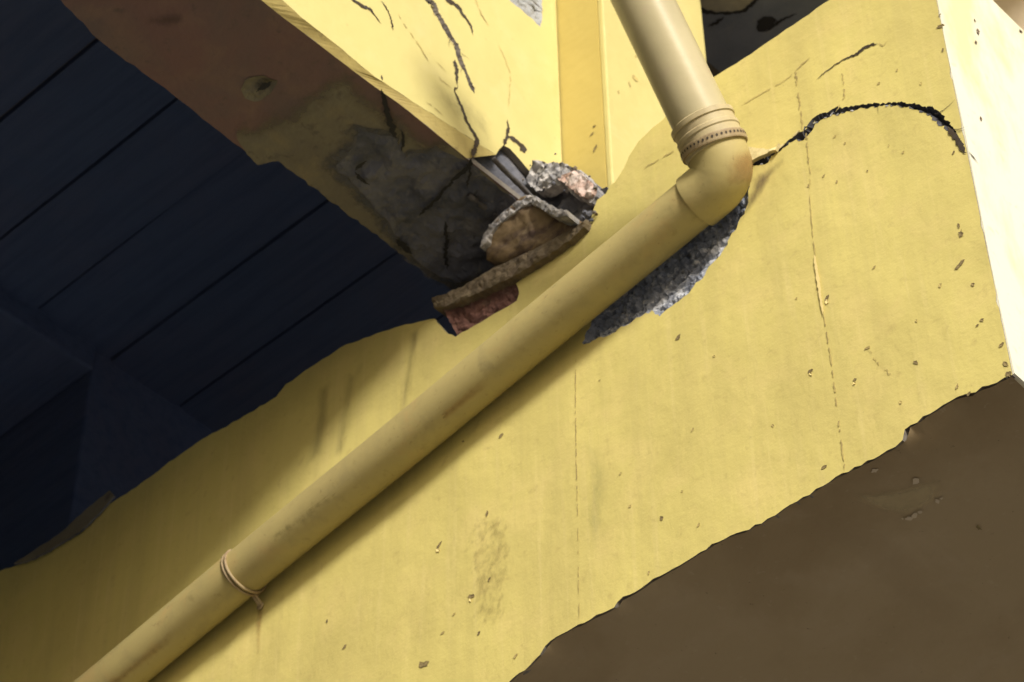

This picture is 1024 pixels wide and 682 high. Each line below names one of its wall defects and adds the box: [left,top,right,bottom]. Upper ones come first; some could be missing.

peeling [510,0,543,27]
crack [353,0,527,269]
spalling [327,124,609,335]
spalling [582,186,750,344]
crack [743,42,976,469]